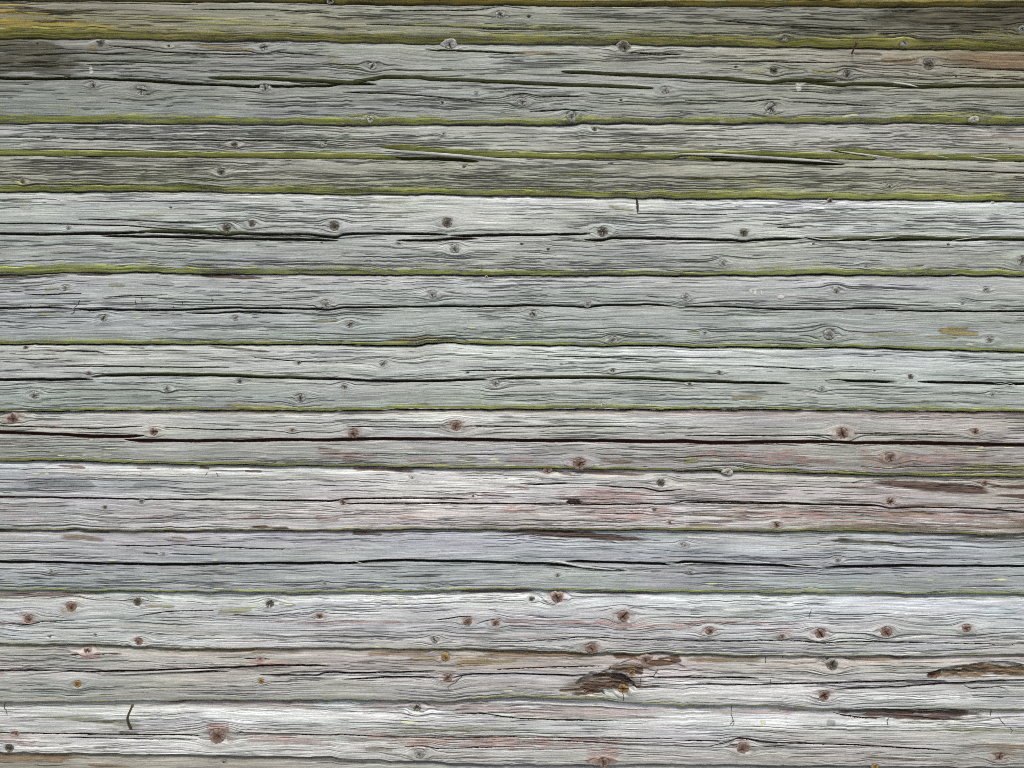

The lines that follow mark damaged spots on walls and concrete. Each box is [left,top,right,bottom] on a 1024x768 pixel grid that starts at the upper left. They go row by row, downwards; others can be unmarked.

crack [0,45,1024,112]
water stain [686,115,742,131]
crack [372,147,544,162]
crack [575,150,1024,174]
water stain [0,274,125,291]
crack [0,425,1024,447]
crack [0,544,1024,571]
peeling [559,655,681,695]
peeling [929,670,1024,678]